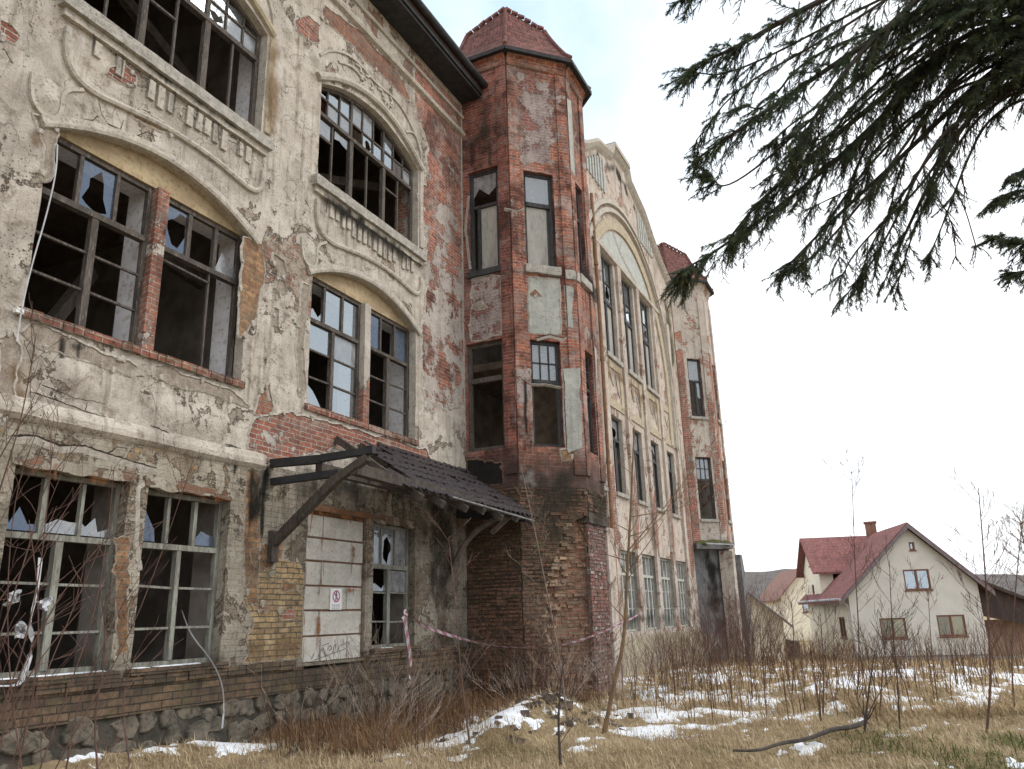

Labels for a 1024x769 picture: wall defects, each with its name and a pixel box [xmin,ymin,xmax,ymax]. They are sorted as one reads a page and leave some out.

spalling [104,64,138,88]
flaking render [517,72,555,166]
spalling [293,4,502,414]
spalling [236,236,310,398]
damp [249,466,269,537]
spalling [152,363,430,664]
spalling [591,339,700,581]
spalling [111,535,131,662]